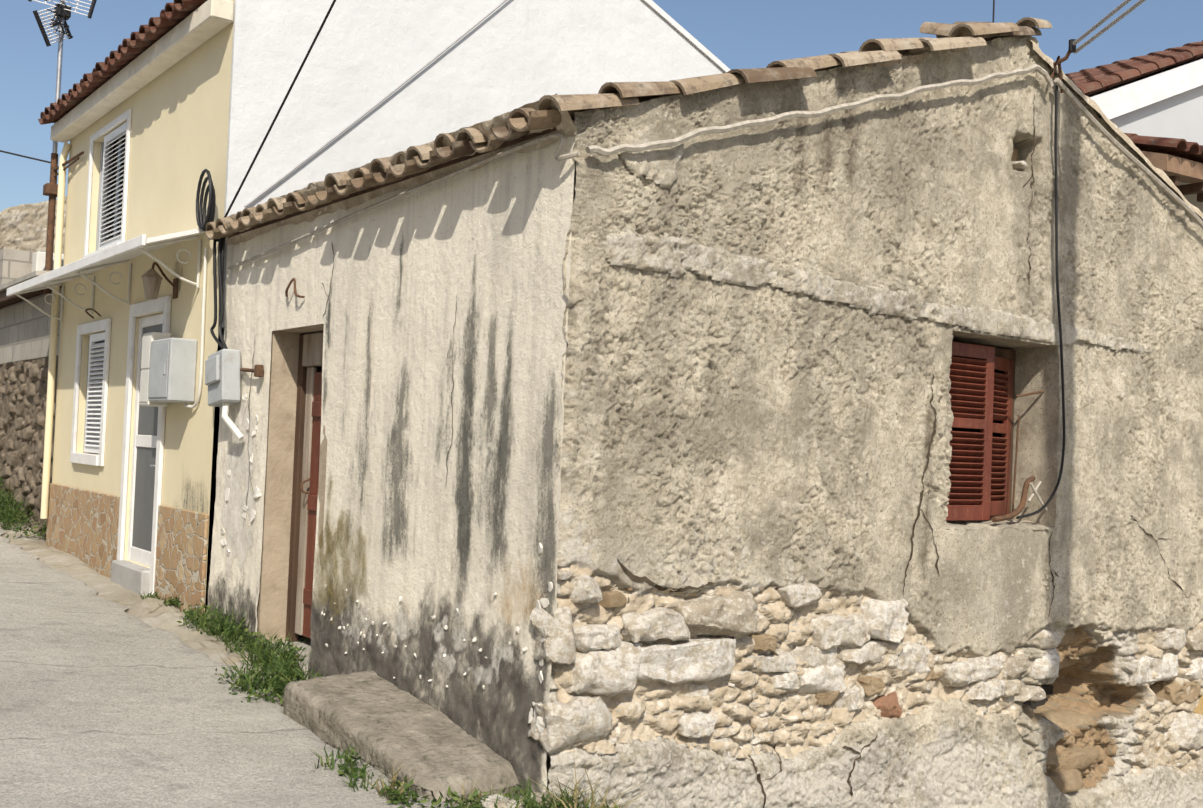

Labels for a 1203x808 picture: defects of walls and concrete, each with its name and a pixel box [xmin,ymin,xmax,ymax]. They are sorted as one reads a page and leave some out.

water stain [207,575,256,640]
peeling [321,589,417,658]
water stain [308,297,547,796]
water stain [531,373,557,614]
flaking render [419,559,1203,793]
crack [903,374,939,595]